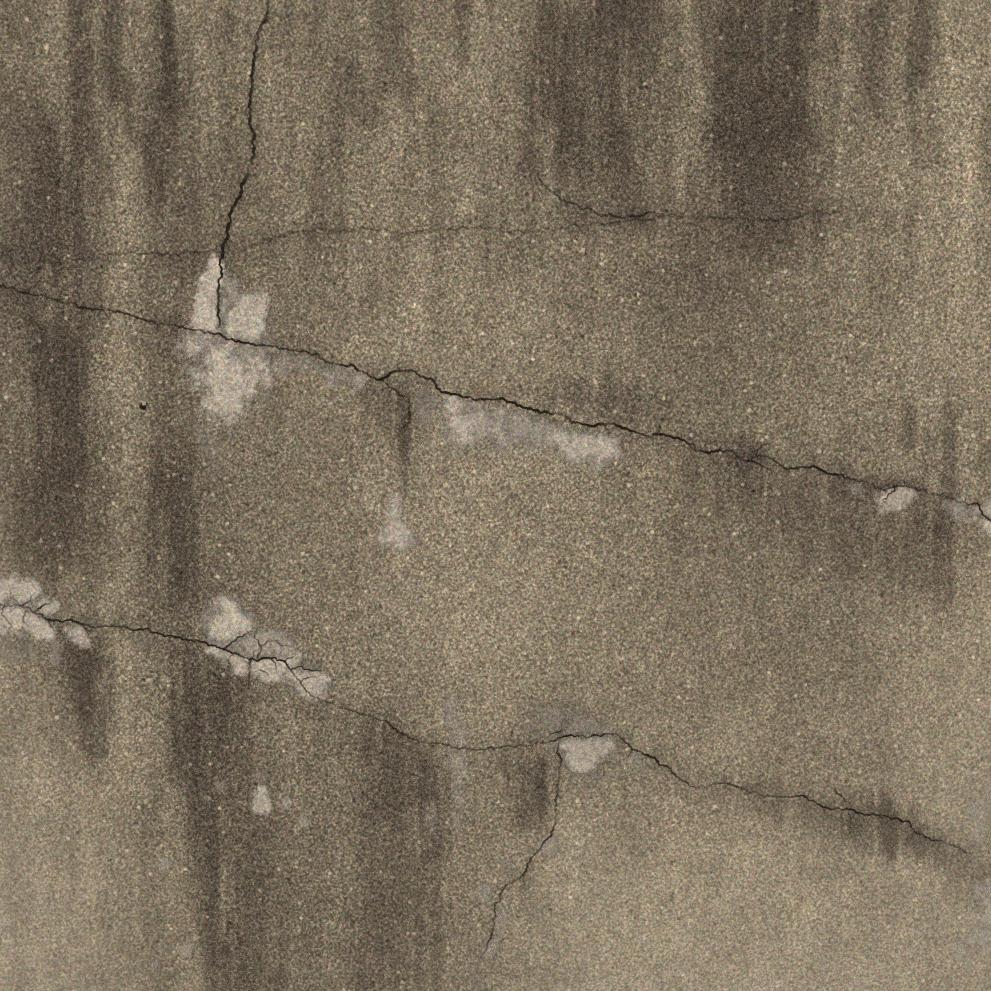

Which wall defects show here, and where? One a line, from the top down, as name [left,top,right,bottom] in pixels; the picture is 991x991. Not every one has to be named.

water stain [723,0,805,253]
crack [72,0,919,500]
crack [0,284,35,296]
water stain [437,395,622,472]
crack [970,502,991,522]
crack [1,601,318,693]
crack [351,710,414,740]
crack [439,742,527,750]
water stain [558,736,615,774]
crack [487,730,695,945]
crack [784,788,963,851]